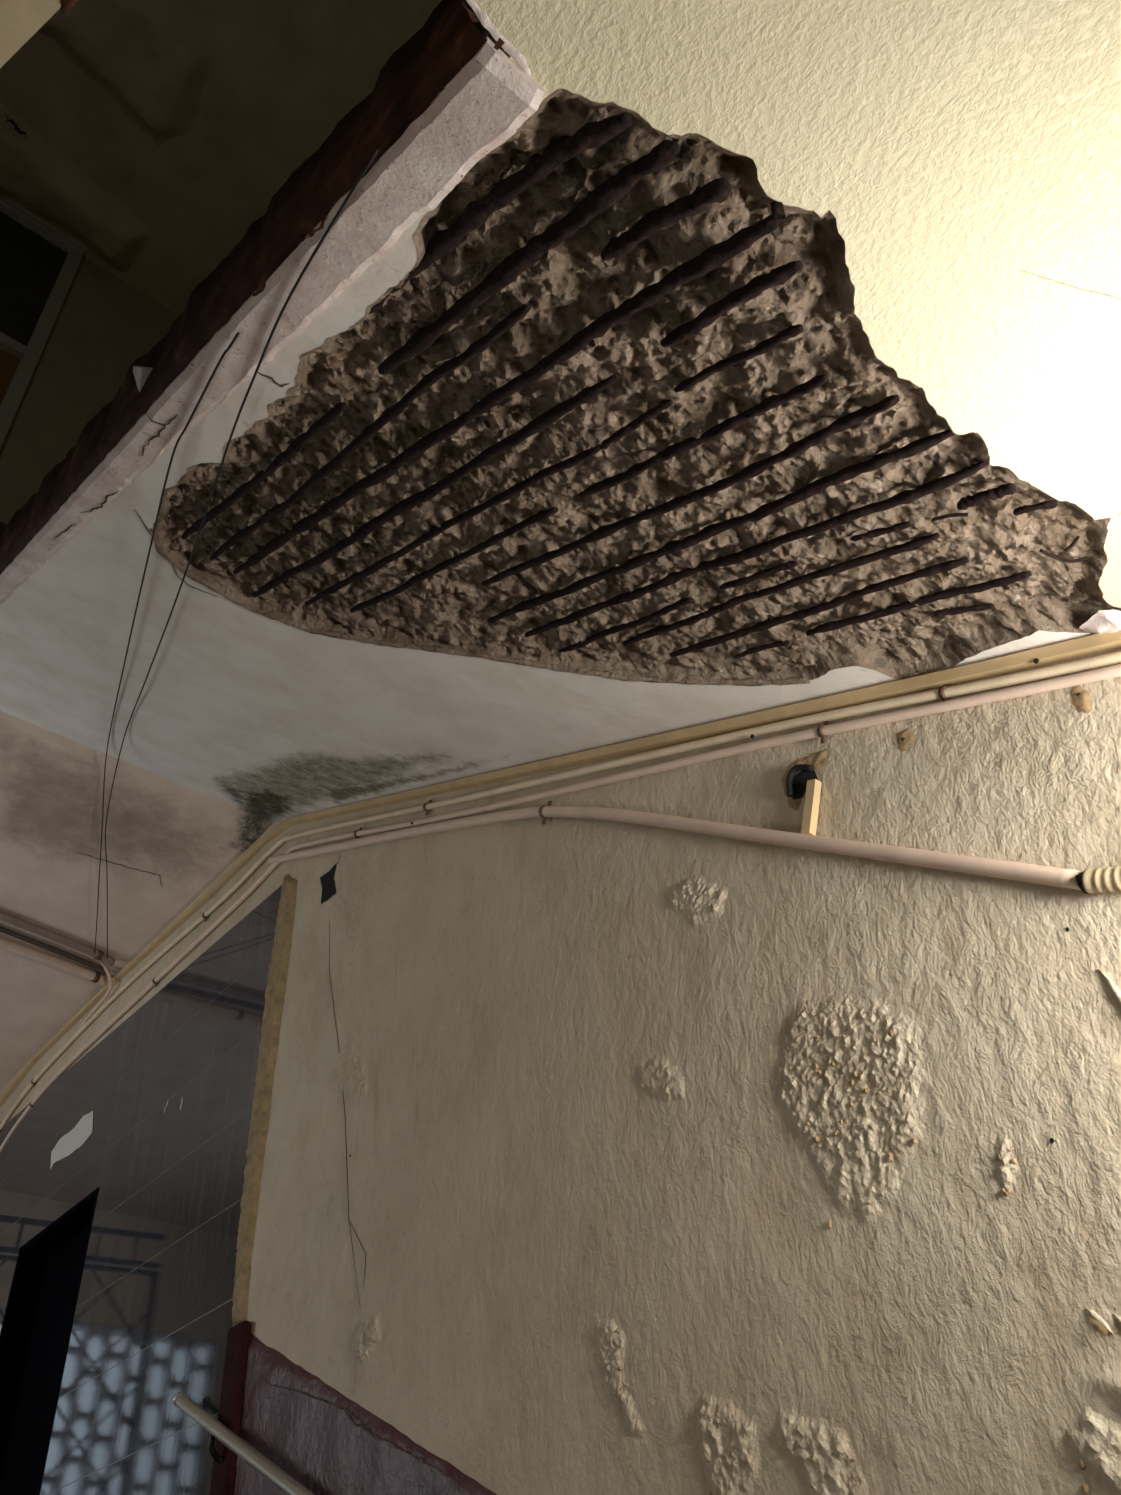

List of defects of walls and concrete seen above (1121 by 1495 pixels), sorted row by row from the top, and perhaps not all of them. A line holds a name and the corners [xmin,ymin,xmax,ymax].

spalling [0,0,1121,687]
crack [1020,270,1121,300]
spalling [1070,685,1092,713]
mould [222,757,441,849]
crack [329,931,339,1048]
peeling [774,994,933,1229]
crack [342,1090,366,1305]